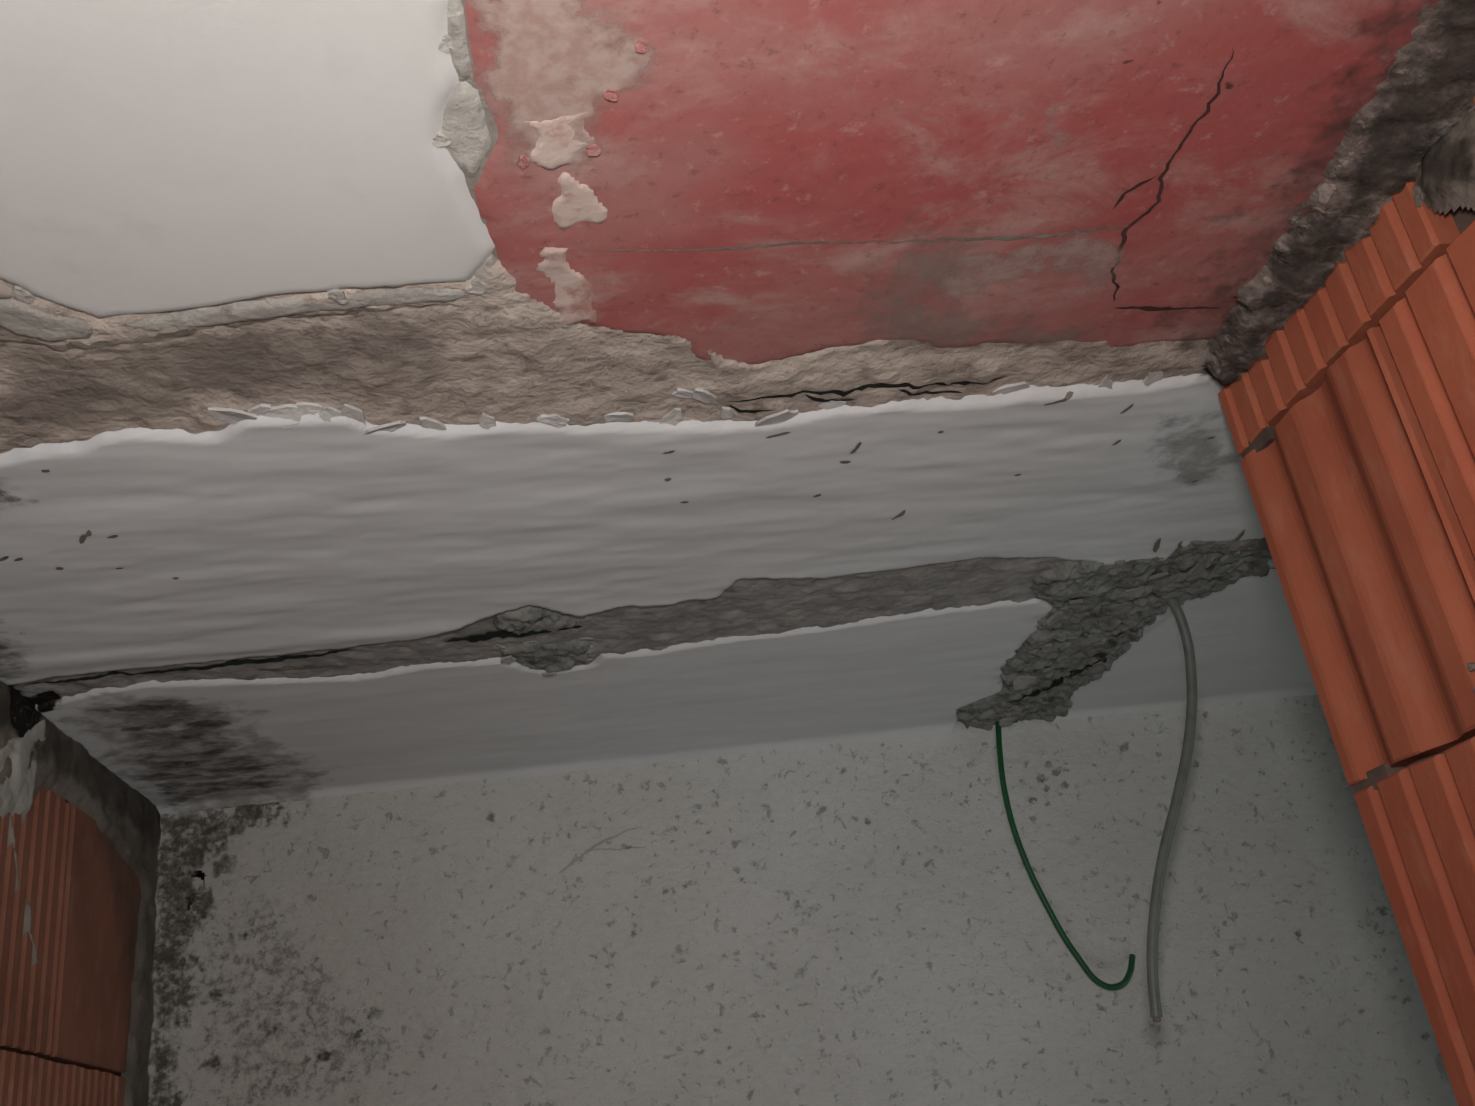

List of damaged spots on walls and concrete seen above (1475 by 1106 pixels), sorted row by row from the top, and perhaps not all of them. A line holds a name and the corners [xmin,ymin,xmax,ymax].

peeling [0,0,1209,454]
crack [594,47,1234,311]
peeling [9,529,1276,738]
damp [114,701,286,1106]